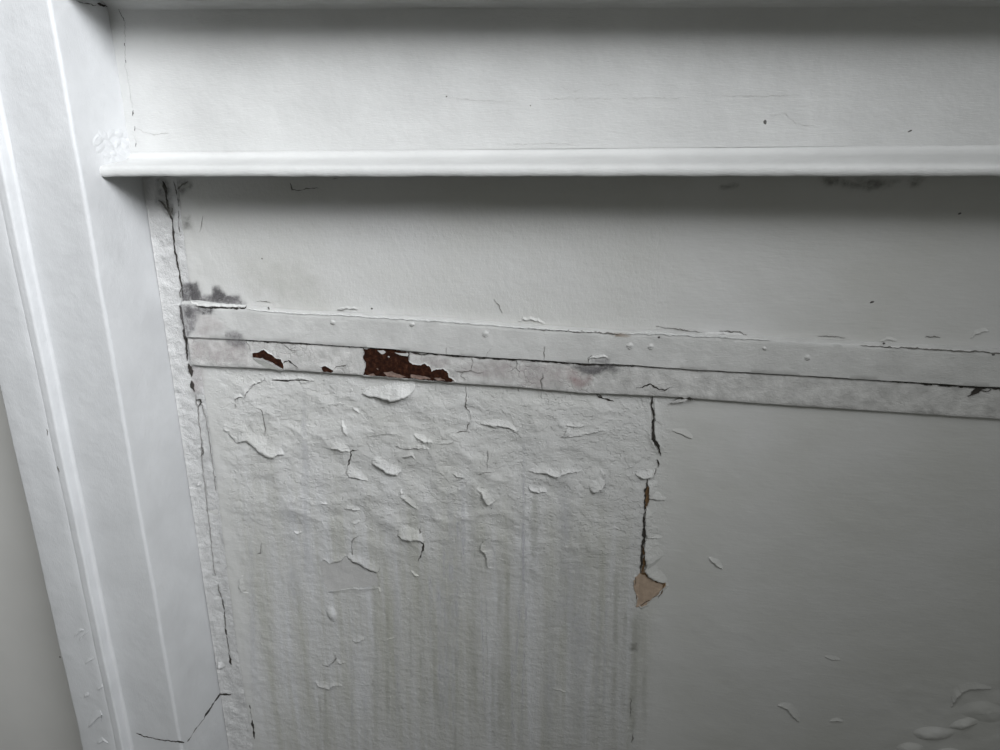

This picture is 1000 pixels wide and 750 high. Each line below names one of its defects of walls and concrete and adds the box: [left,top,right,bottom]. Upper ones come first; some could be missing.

rust [252,349,298,371]
rust [362,347,456,383]
peeling [233,374,314,408]
peeling [362,381,415,402]
crack [158,181,232,665]
peeling [223,409,284,459]
peeling [366,433,453,476]
peeling [528,466,582,493]
crack [636,384,670,573]
peeling [320,536,382,593]
peeling [631,469,669,610]
crack [137,693,255,743]